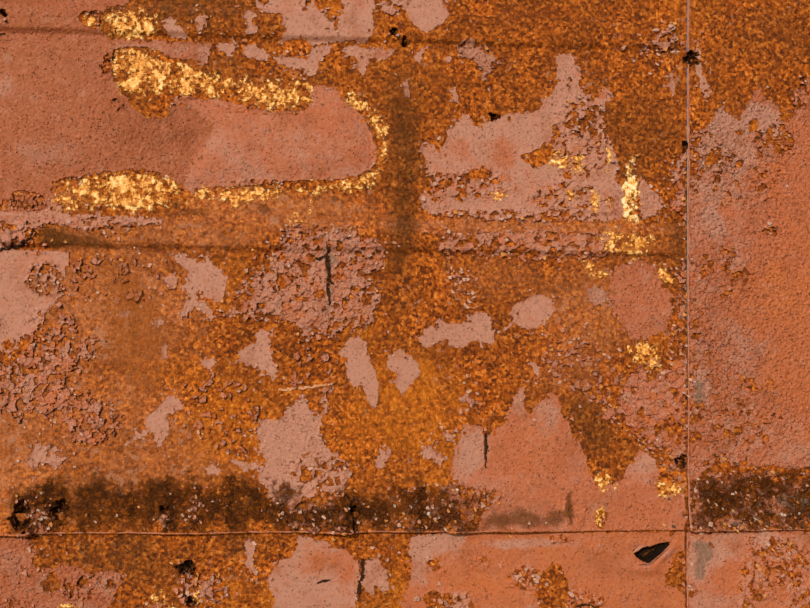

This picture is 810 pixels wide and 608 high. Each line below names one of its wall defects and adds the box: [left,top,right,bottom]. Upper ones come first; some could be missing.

corrosion [84,8,314,110]
peeling [445,38,502,91]
peeling [631,20,684,75]
corrosion [346,91,389,161]
corrosion [50,172,180,213]
corrosion [191,184,281,208]
corrosion [287,169,380,223]
corrosion [589,159,655,261]
peeling [0,0,449,608]
peeling [385,46,810,608]
corrosion [8,472,478,538]
corrosion [683,467,810,531]